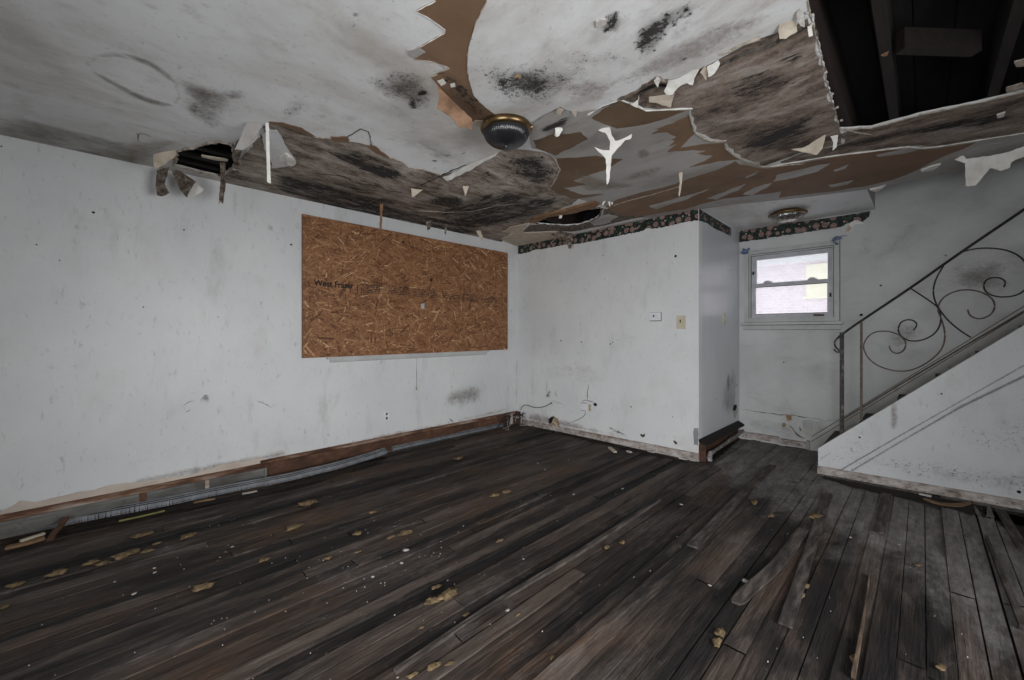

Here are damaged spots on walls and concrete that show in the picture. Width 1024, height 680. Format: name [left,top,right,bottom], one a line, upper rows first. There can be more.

leakage [225,124,577,242]
mould [371,68,432,109]
peeling [407,0,493,130]
mould [485,53,587,103]
mould [596,11,619,33]
mould [634,6,692,52]
peeling [529,60,1024,224]
leakage [624,19,1024,166]